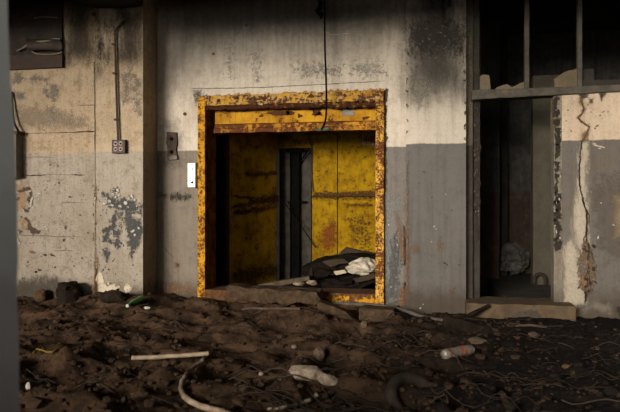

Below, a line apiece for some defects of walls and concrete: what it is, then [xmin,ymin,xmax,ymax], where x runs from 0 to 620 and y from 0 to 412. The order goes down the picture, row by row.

spalling [17,181,74,266]
peeling [95,186,144,292]
corrosion [255,110,303,118]
corrosion [313,190,376,255]
corrosion [323,88,388,193]
peeling [552,96,569,251]
crack [577,97,597,303]
spalling [577,236,599,292]